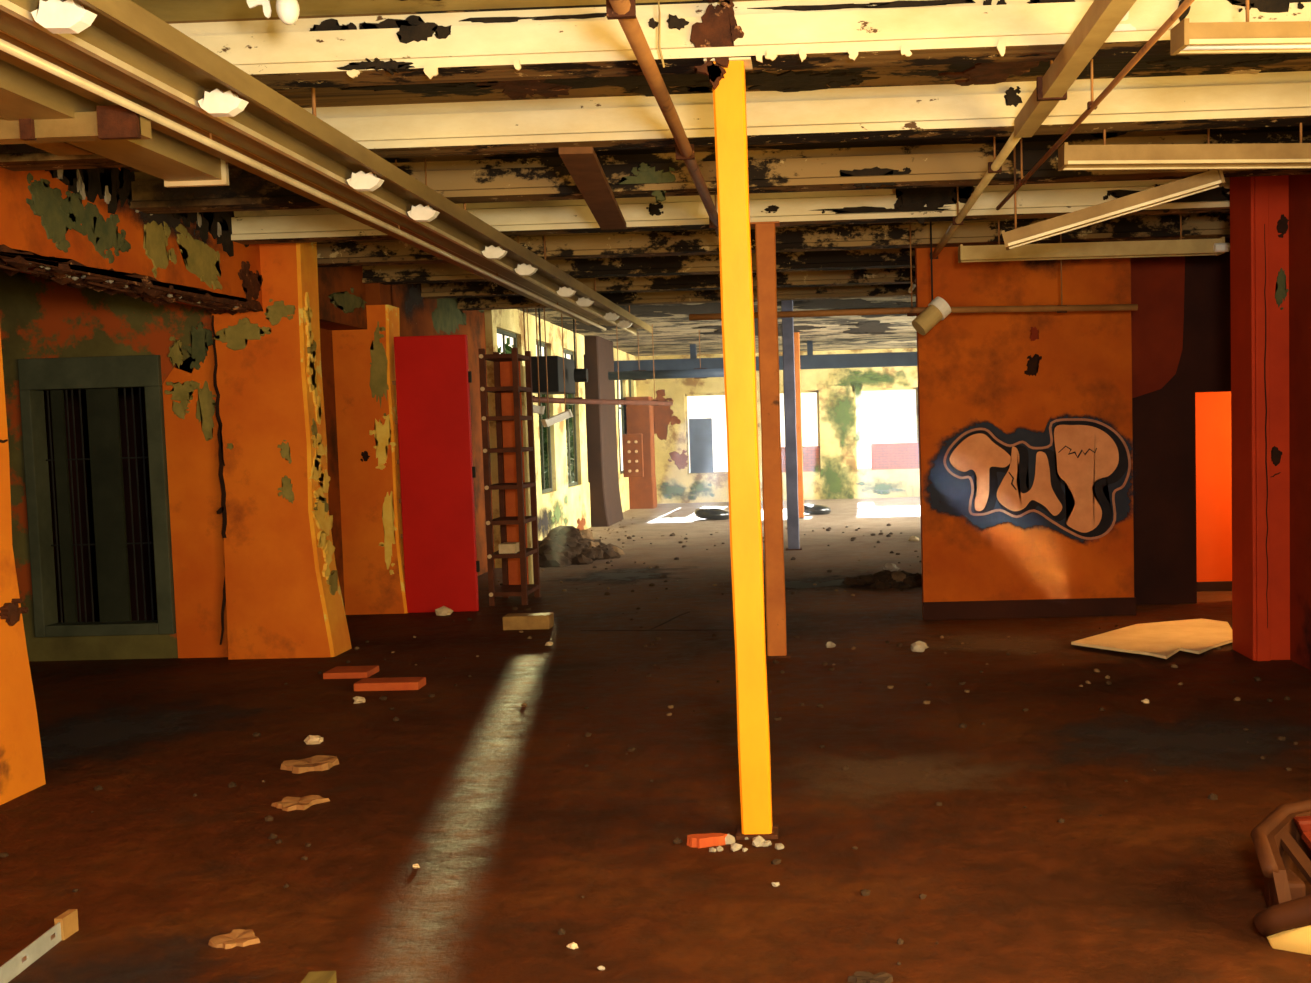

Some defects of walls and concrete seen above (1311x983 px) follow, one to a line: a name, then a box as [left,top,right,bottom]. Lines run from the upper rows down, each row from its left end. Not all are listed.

peeling [310,0,606,44]
peeling [1228,0,1311,13]
peeling [337,58,500,91]
peeling [543,0,1007,97]
peeling [1146,53,1285,74]
peeling [1004,86,1023,107]
peeling [759,132,1127,150]
peeling [809,167,975,224]
peeling [1162,186,1230,213]
peeling [777,299,916,336]
spalling [0,167,338,595]
peeling [360,322,396,470]